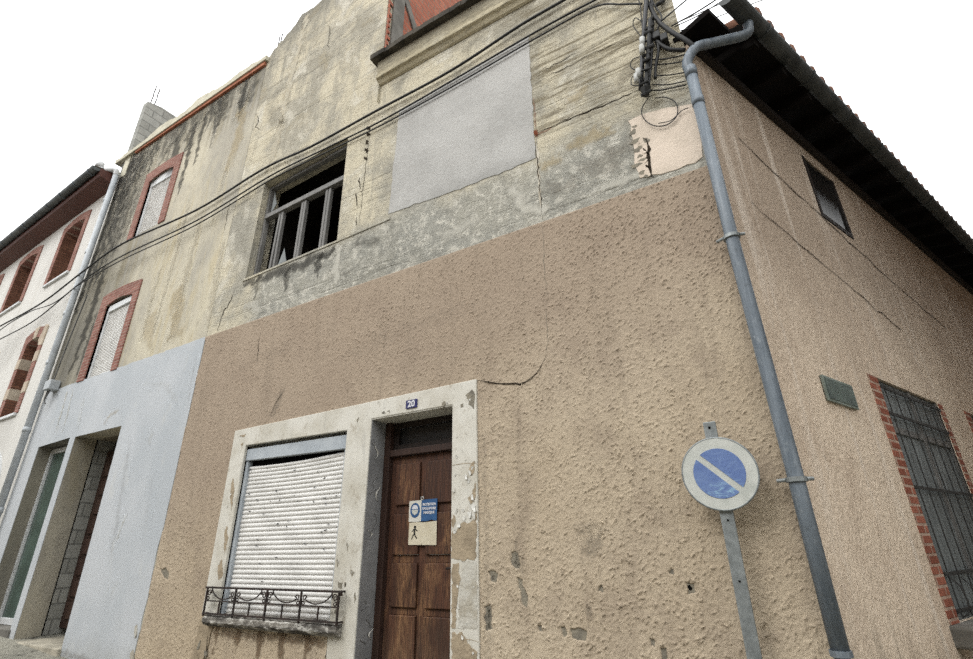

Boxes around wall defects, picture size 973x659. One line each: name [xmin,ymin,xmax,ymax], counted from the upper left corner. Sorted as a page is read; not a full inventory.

leakage [163,93,228,193]
crack [355,126,371,224]
flaking render [628,104,703,178]
crack [479,90,638,385]
peeling [451,461,492,659]
flaking render [511,552,528,607]
flaking render [561,626,587,641]